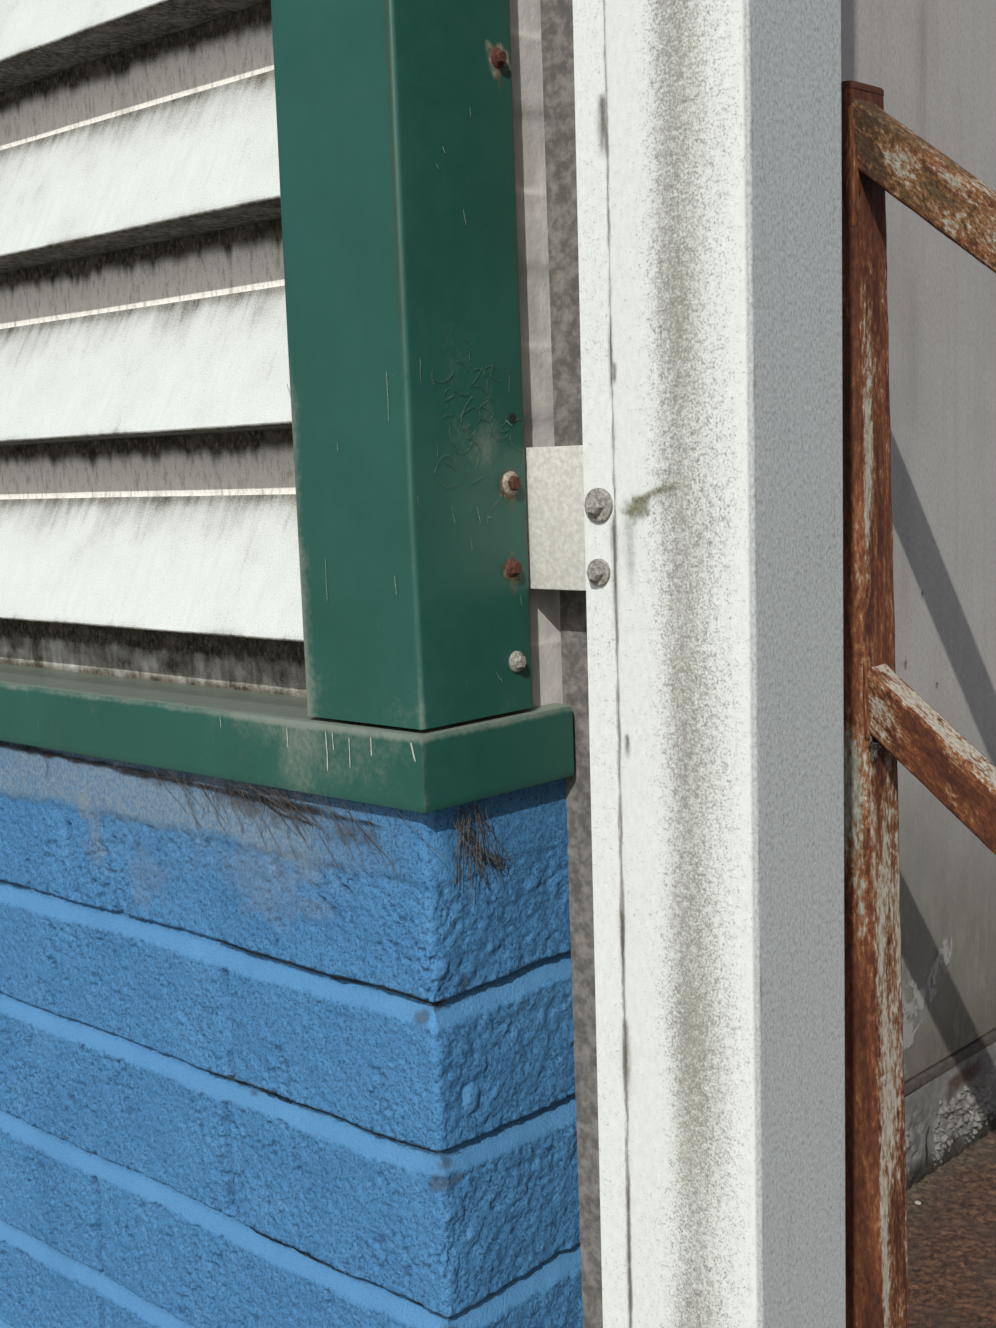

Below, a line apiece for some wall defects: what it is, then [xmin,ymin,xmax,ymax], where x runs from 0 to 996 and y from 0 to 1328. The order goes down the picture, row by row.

water stain [0,743,312,862]
peeling [902,937,952,1050]
water stain [900,874,996,1082]